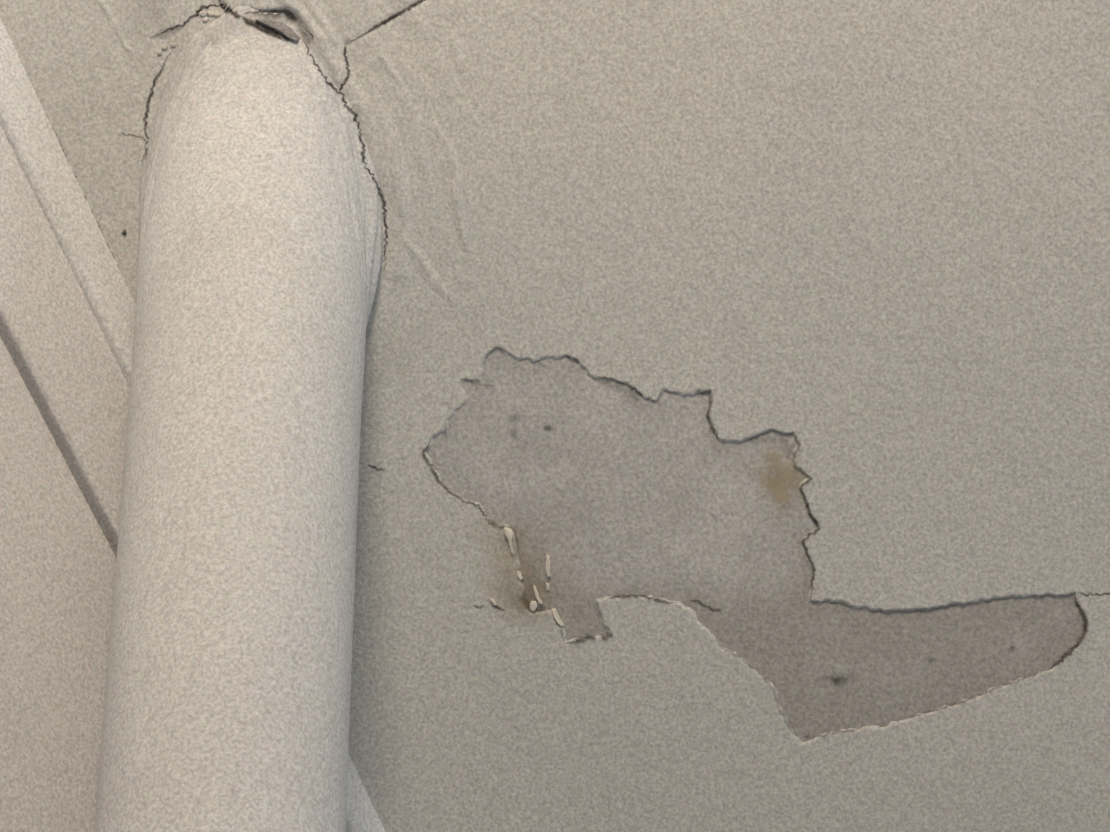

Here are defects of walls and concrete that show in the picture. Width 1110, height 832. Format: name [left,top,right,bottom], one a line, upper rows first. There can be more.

crack [143,3,240,160]
crack [304,0,423,268]